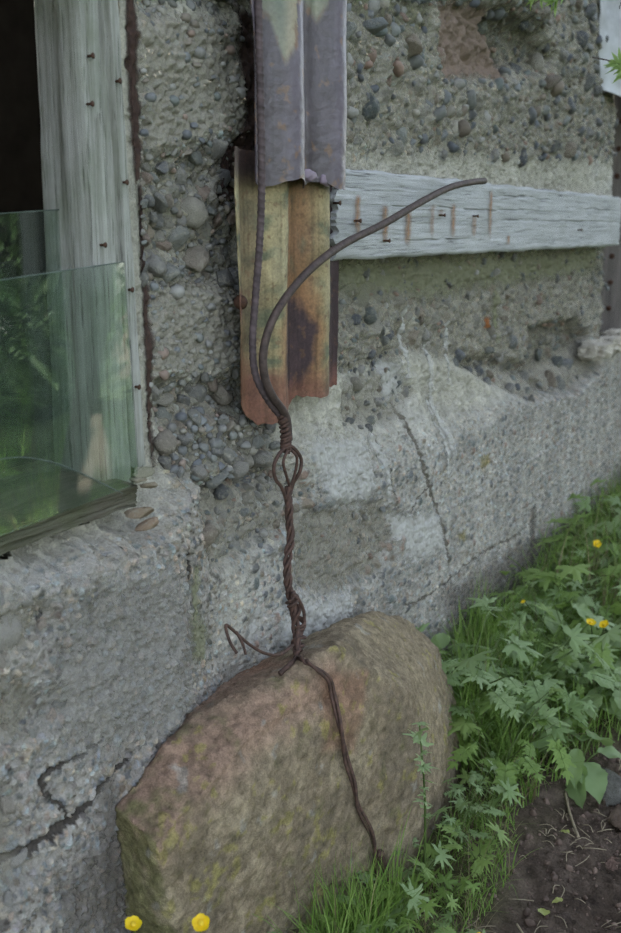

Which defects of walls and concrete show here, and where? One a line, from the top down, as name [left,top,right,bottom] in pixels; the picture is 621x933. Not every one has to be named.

corrosion [125,0,146,273]
corrosion [143,285,155,459]
spalling [338,247,609,432]
crack [388,398,537,606]
crack [0,736,135,865]